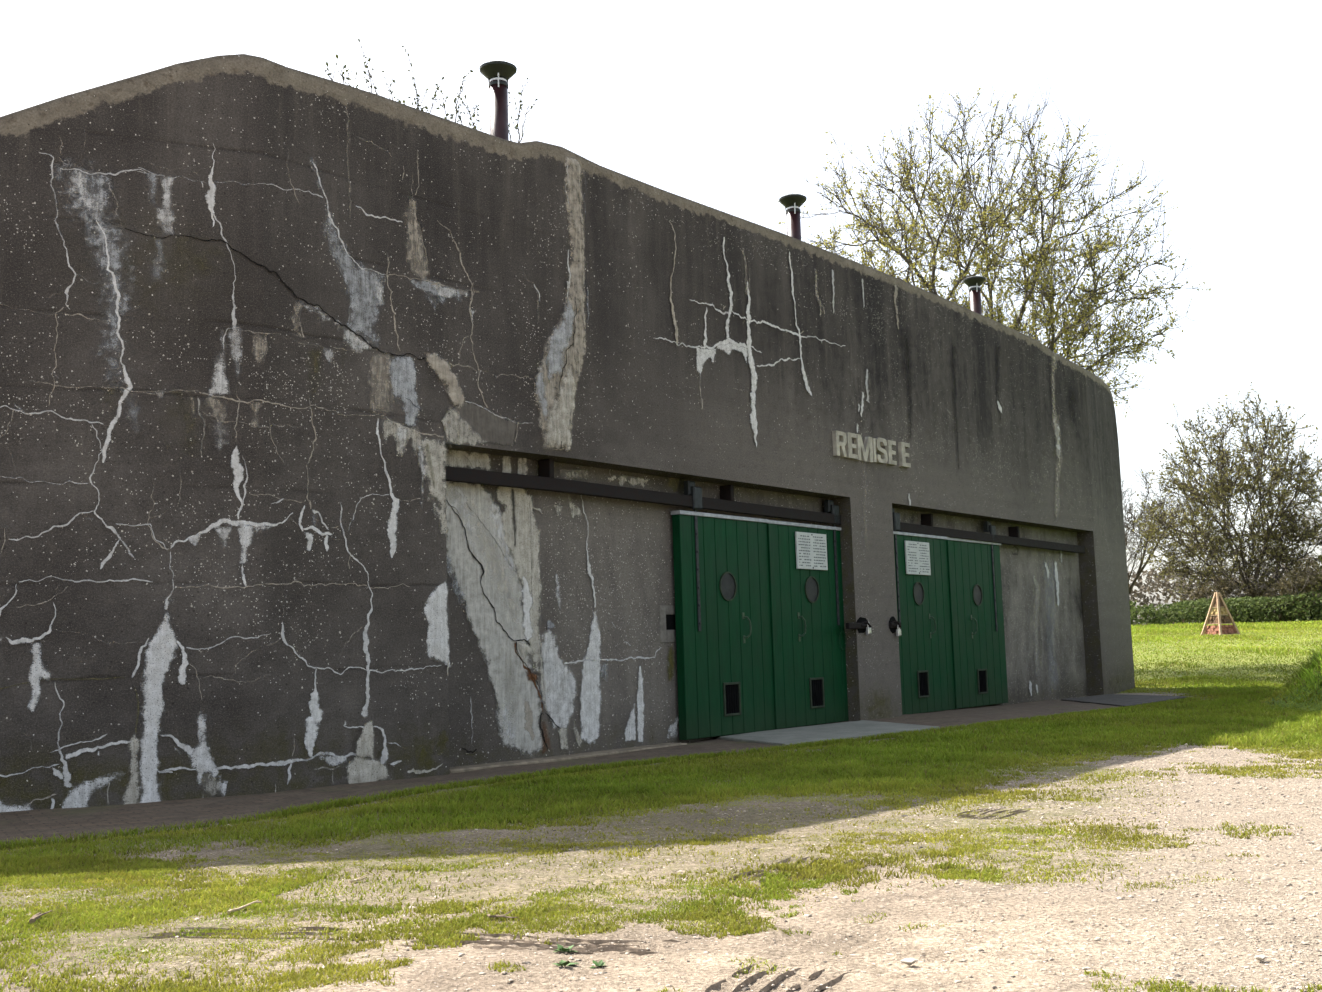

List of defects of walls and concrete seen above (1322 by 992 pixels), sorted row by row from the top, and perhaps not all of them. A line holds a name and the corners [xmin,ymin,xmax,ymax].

efflorescence [72,172,132,379]
crack [669,221,845,396]
crack [0,144,531,717]
damp [293,161,661,757]
crack [0,677,131,787]
crack [158,741,356,792]